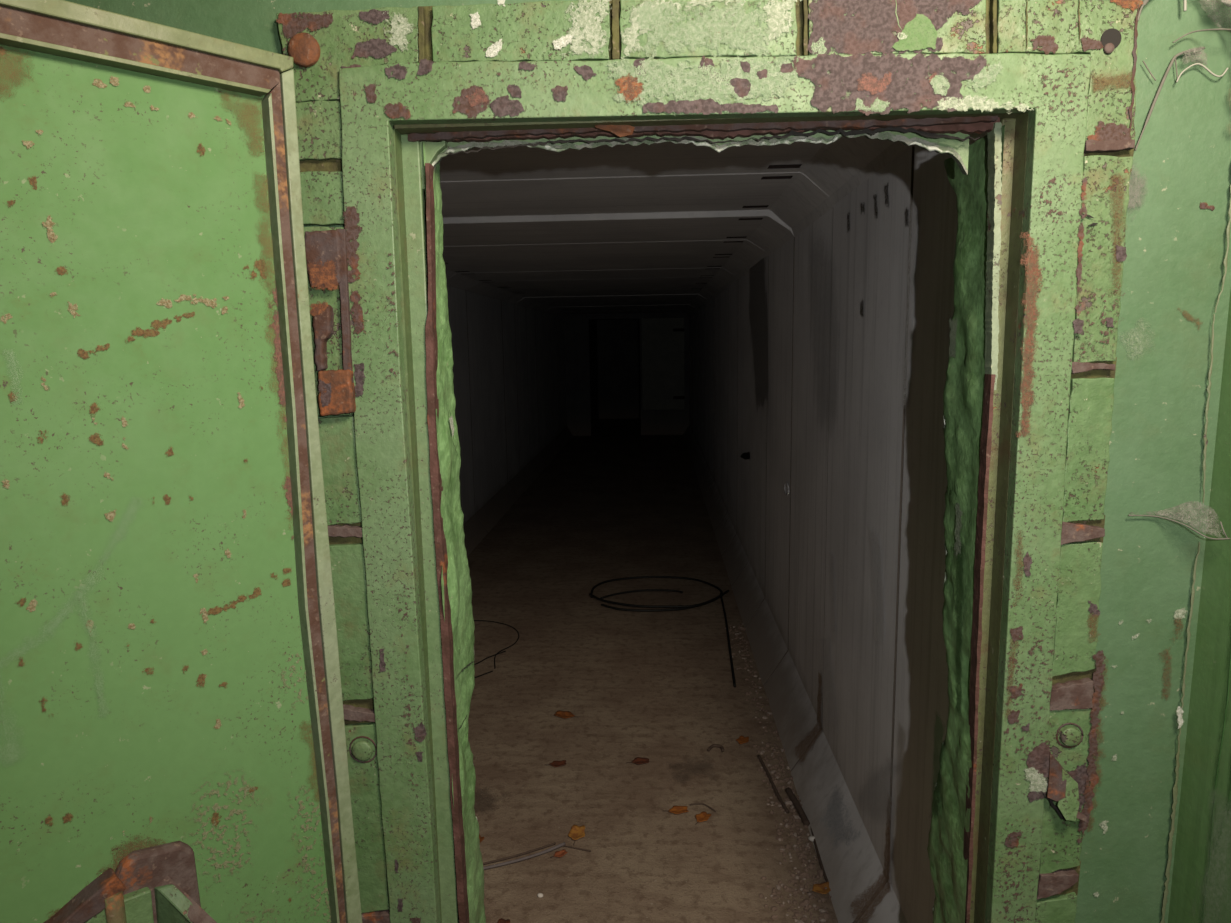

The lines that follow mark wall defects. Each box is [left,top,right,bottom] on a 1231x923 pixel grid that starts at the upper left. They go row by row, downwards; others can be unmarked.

peeling [469,12,481,29]
rust [341,9,611,142]
peeling [486,39,502,57]
peeling [552,0,612,59]
rust [574,0,998,133]
rust [1026,1,1059,54]
rust [1087,0,1143,141]
spalling [686,140,739,152]
spalling [759,133,850,146]
spalling [909,141,954,154]
rust [309,206,367,334]
rust [1016,232,1044,438]